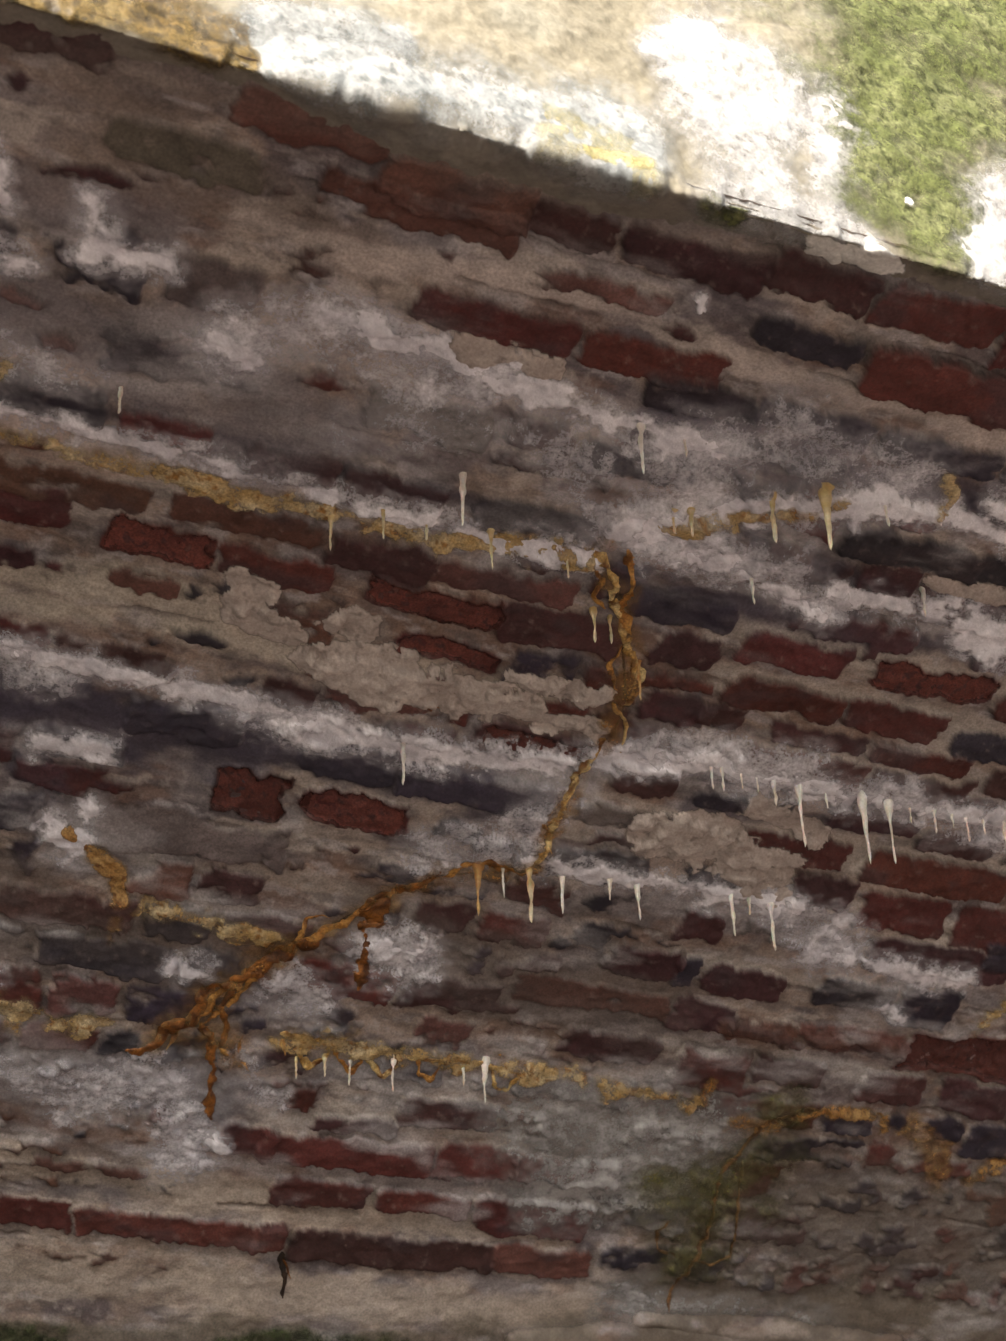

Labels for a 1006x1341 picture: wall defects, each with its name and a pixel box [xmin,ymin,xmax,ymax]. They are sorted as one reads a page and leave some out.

damp [0,143,16,215]
damp [0,236,40,276]
damp [66,185,181,283]
damp [0,283,1006,675]
crack [125,548,646,1120]
damp [0,634,1006,994]
damp [256,958,335,1018]
damp [873,1001,907,1025]
damp [1,1050,232,1176]
damp [472,1081,756,1231]
damp [591,1281,754,1322]